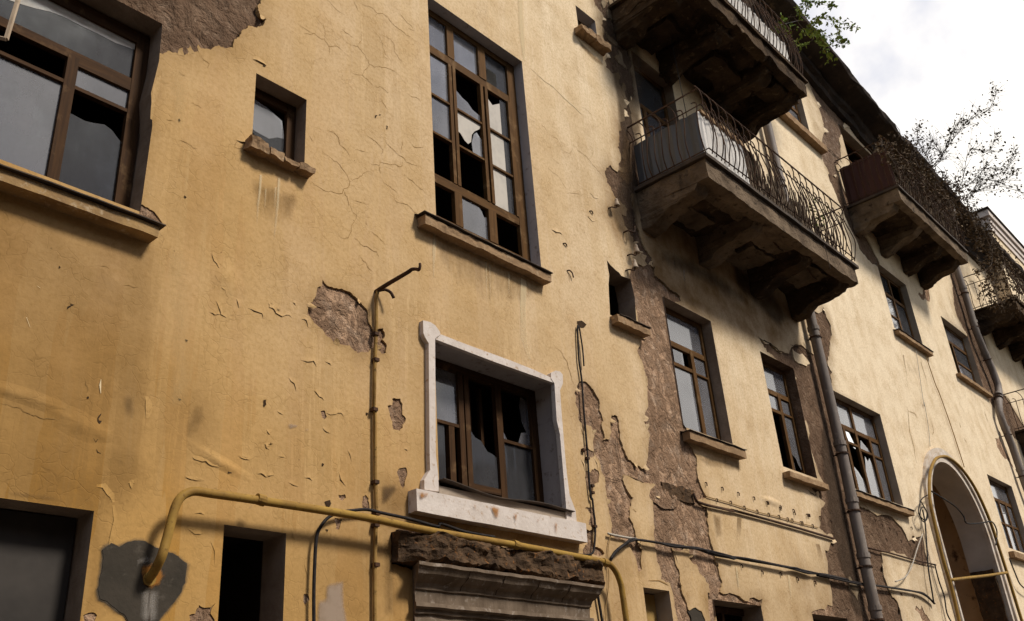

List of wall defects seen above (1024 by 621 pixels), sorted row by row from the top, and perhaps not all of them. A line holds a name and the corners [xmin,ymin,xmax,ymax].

flaking render [118,0,265,56]
crack [303,0,420,107]
crack [310,131,423,271]
flaking render [809,84,879,266]
peeling [307,282,385,354]
flaking render [575,0,761,621]
peeling [388,399,405,430]
peeling [397,468,407,488]
flaking render [760,308,926,621]